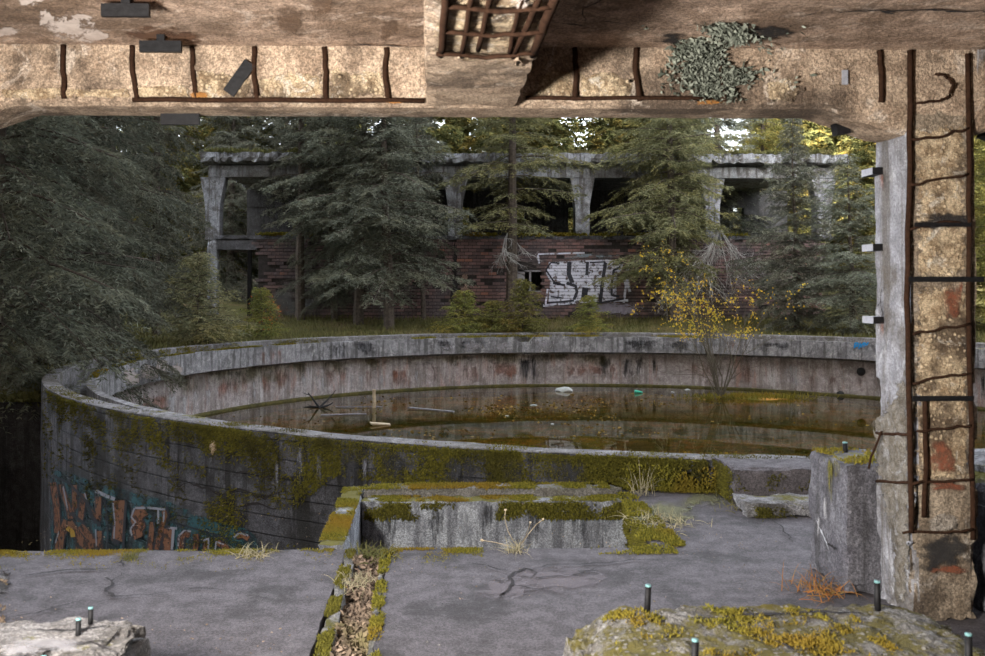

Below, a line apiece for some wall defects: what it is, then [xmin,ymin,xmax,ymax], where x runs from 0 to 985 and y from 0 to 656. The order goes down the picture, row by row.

peeling [0,27,18,37]
peeling [19,0,108,43]
spalling [427,0,568,68]
rust [944,284,962,318]
water stain [438,340,567,380]
water stain [580,355,610,374]
water stain [624,340,658,377]
rust [930,441,964,490]
crack [473,559,657,599]